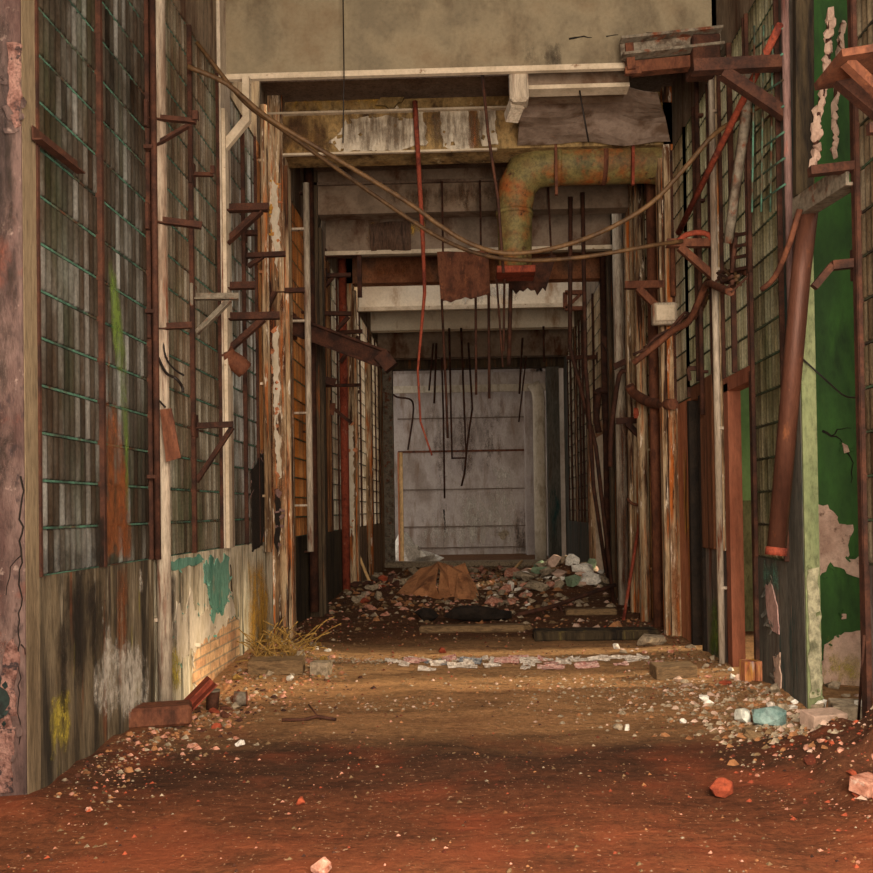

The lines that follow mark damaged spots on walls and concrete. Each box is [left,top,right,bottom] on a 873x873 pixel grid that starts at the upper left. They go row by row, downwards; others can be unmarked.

flaking render [0,42,27,134]
leakage [349,114,405,148]
leakage [424,111,489,142]
rust [107,414,130,555]
flaking render [0,638,22,793]
crack [6,476,26,744]
leakage [62,580,106,673]
efflorescence [95,642,147,711]
peeling [171,553,240,687]
peeling [800,505,861,729]